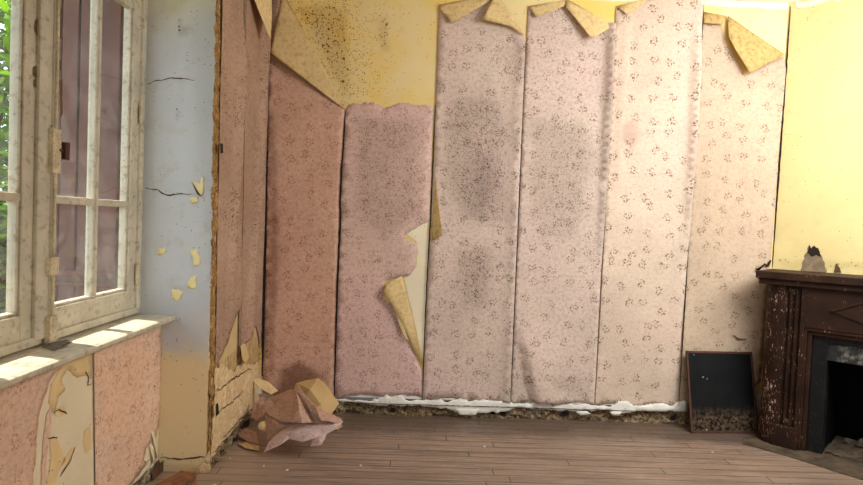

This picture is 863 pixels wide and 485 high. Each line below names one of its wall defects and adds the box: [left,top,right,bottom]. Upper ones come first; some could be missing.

damp [305,7,350,88]
peeling [795,0,842,9]
spalling [172,0,260,473]
damp [443,92,511,227]
damp [530,119,599,245]